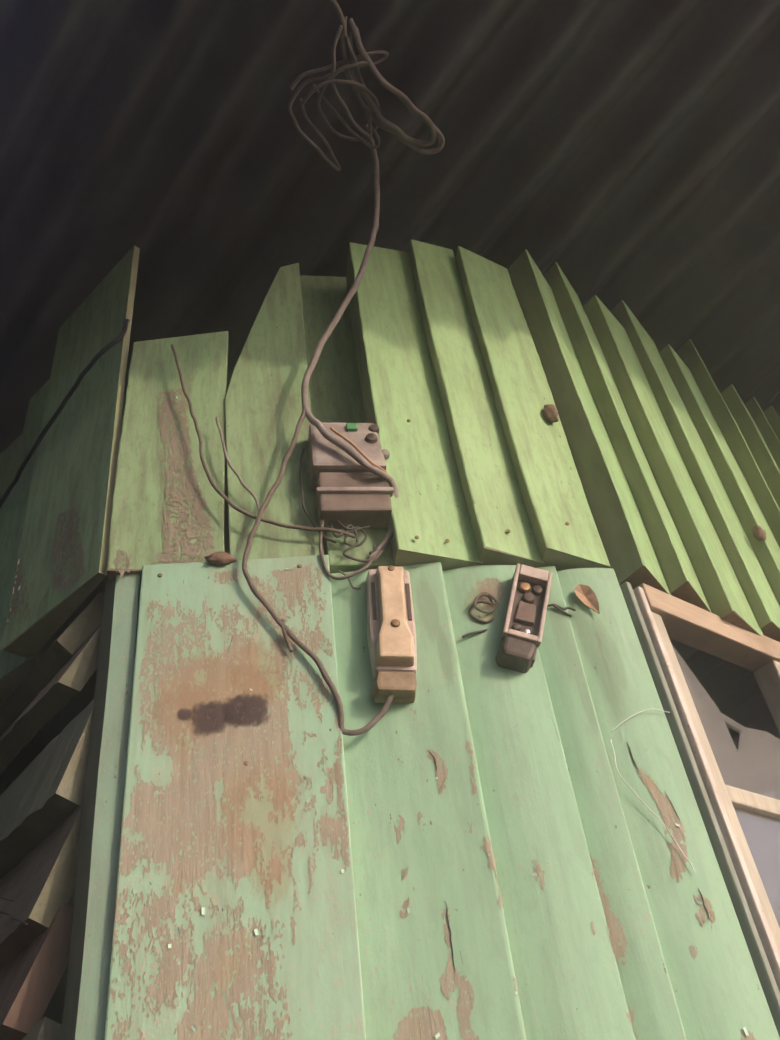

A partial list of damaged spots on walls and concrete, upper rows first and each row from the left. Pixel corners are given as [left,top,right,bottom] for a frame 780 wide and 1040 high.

peeling [154,388,216,565]
peeling [109,563,350,1040]
peeling [426,749,449,795]
peeling [636,767,689,883]
peeling [393,1006,448,1040]
crack [445,902,463,972]
peeling [439,908,479,1040]
peeling [589,852,628,966]